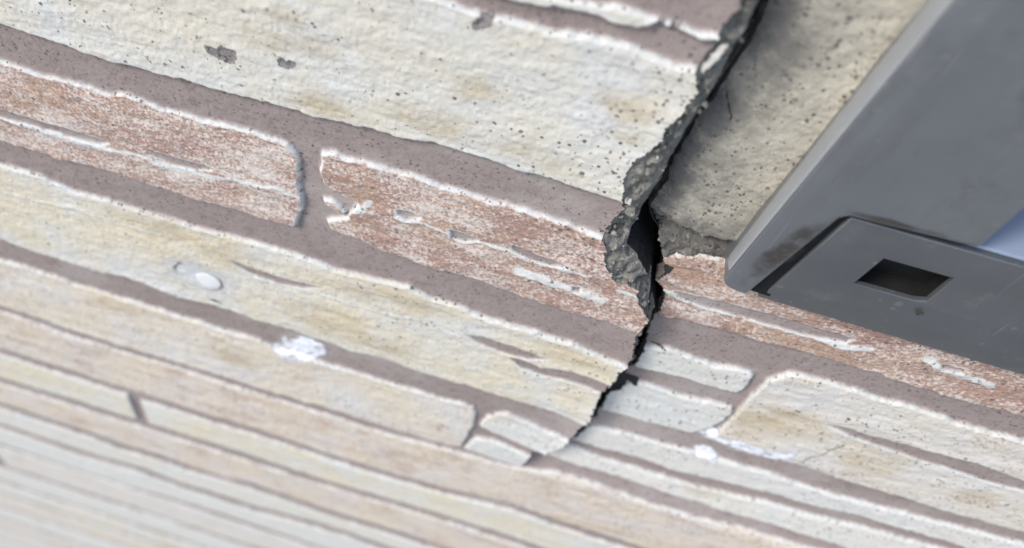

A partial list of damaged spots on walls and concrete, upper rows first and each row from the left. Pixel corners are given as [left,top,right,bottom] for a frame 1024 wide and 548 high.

peeling [277,58,296,69]
crack [523,0,770,466]